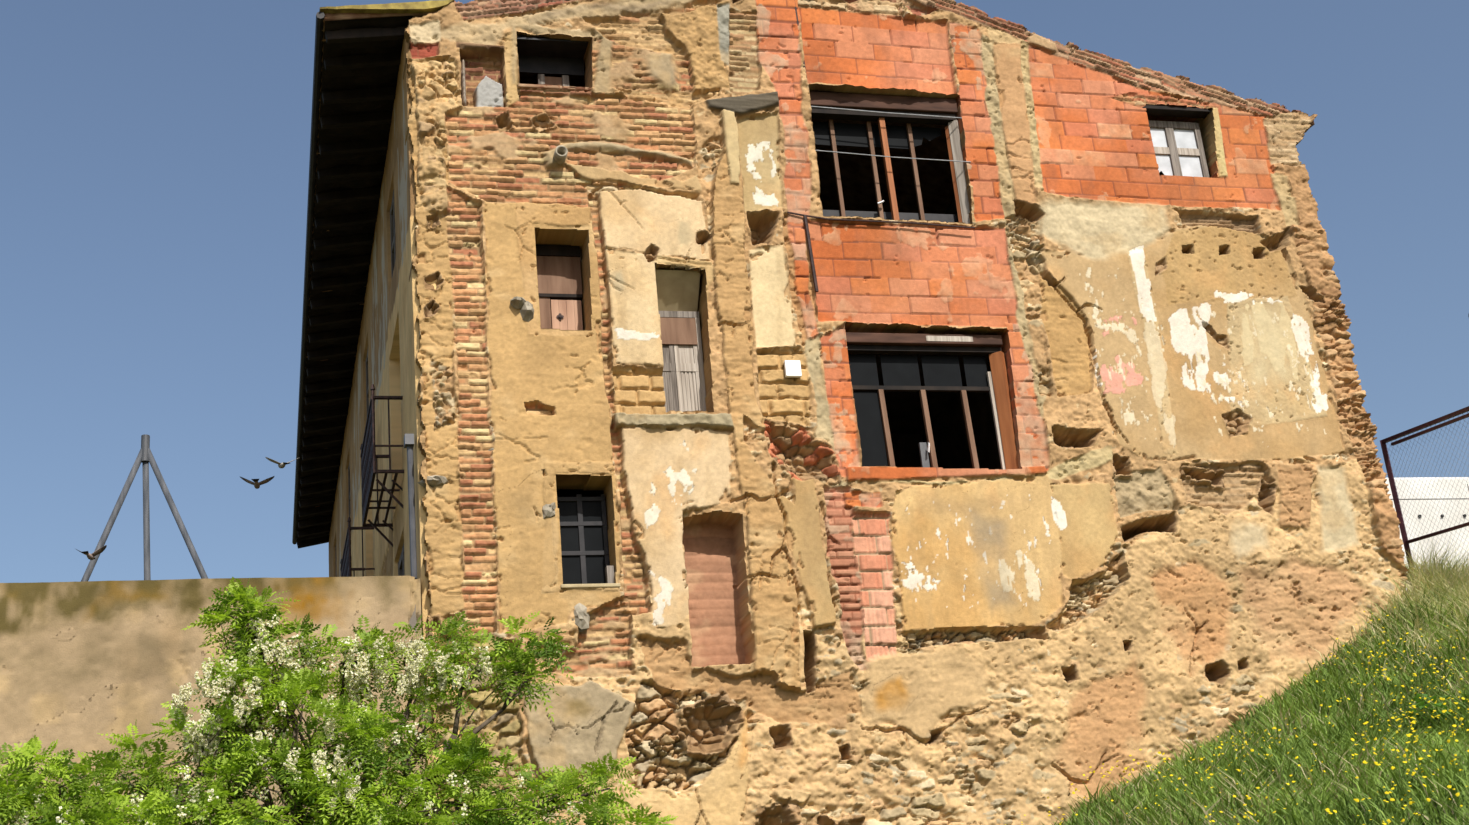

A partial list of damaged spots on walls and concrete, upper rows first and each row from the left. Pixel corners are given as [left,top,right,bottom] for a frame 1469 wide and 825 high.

spalling [746,141,782,246]
spalling [1252,225,1294,259]
peeling [1086,243,1329,445]
spalling [552,193,697,678]
spalling [1052,424,1104,449]
spalling [902,498,1180,651]
spalling [803,627,819,694]
spalling [1203,656,1250,686]
crack [547,701,629,755]
spalling [675,685,740,759]
spalling [769,722,794,753]
spalling [752,796,869,825]